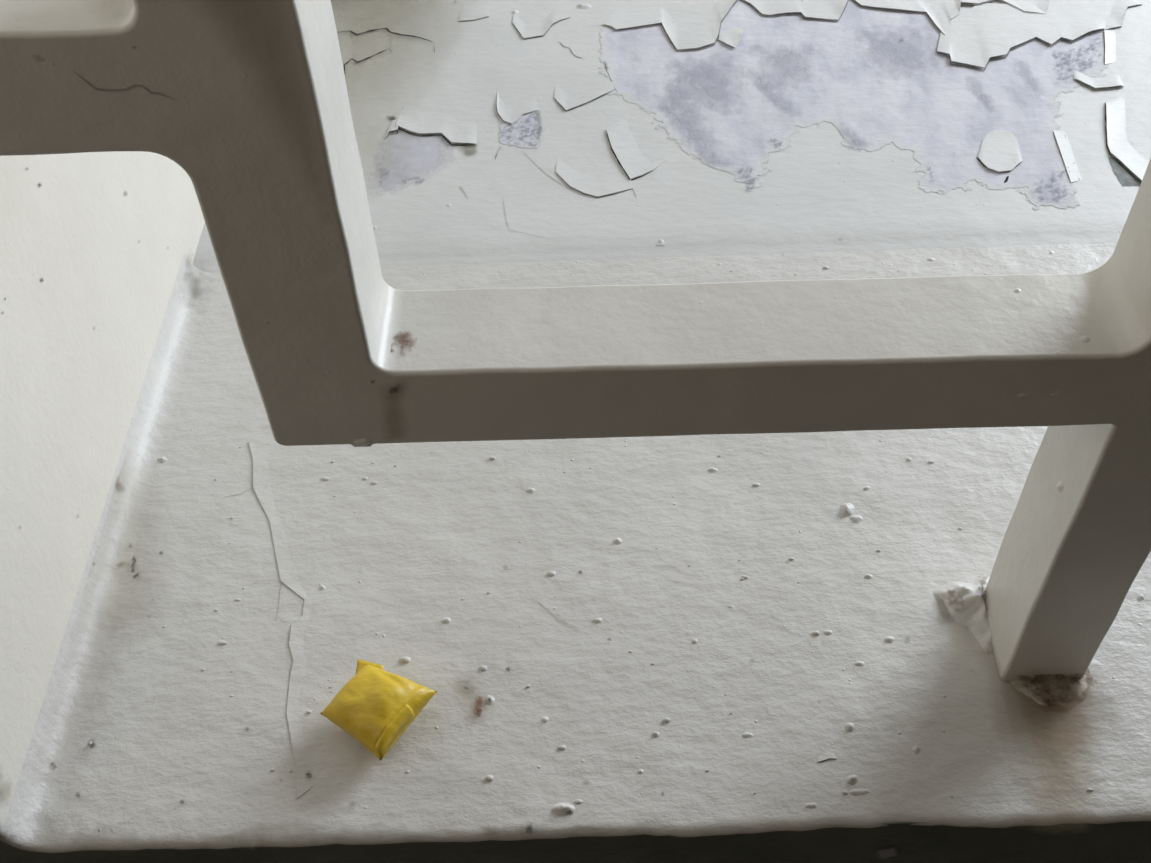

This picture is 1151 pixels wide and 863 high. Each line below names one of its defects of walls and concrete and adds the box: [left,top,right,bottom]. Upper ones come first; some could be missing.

crack [74,71,175,100]
peeling [379,106,477,188]
spalling [496,89,545,148]
peeling [598,0,1149,210]
spalling [1006,670,1092,713]